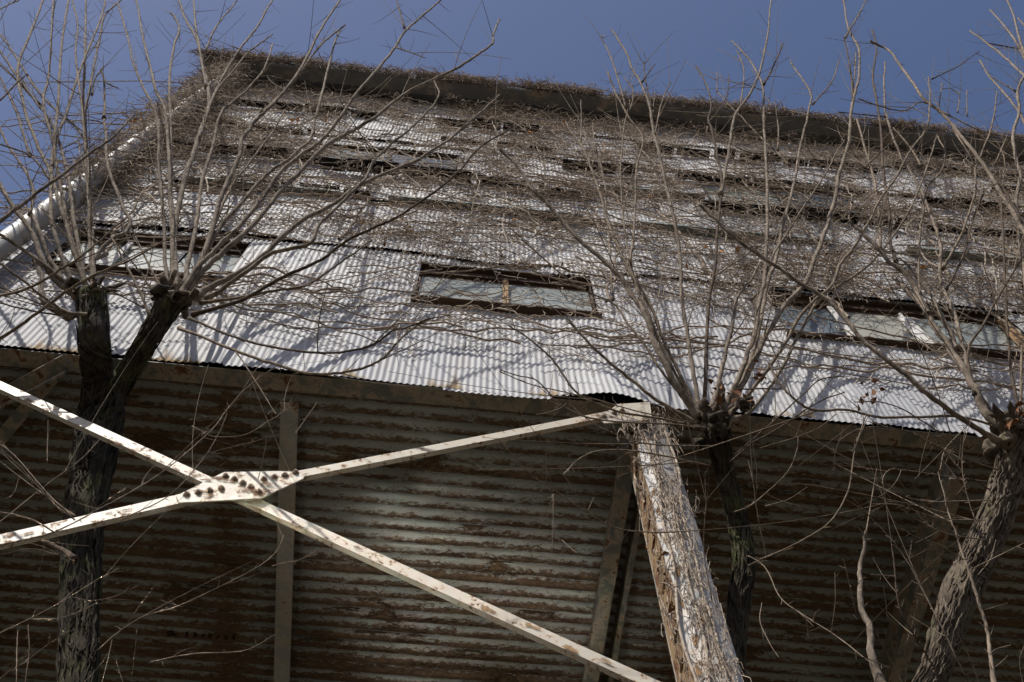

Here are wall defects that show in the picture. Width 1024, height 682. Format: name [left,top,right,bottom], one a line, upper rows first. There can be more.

corrosion [104,395,292,497]
corrosion [323,446,398,480]
corrosion [409,452,519,502]
corrosion [458,522,556,536]
corrosion [736,473,820,541]
corrosion [100,559,257,611]
corrosion [466,557,525,578]
corrosion [304,597,485,652]
corrosion [420,649,539,682]